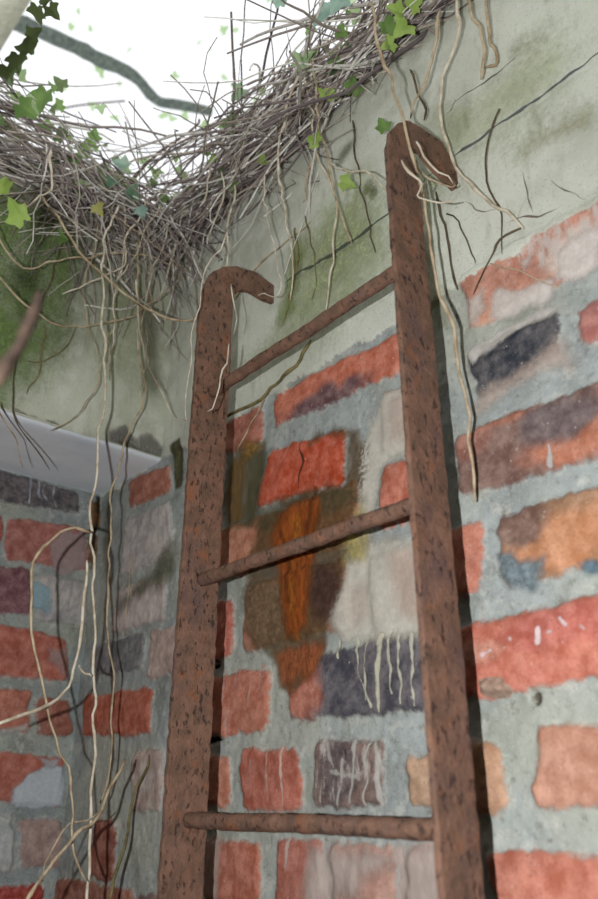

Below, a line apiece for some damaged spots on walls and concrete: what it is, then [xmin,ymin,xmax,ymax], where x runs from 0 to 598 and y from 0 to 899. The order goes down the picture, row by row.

crack [448,52,598,157]
crack [283,214,388,285]
crack [297,439,305,482]
leakage [359,388,405,514]
leakage [328,529,419,711]
leakage [326,738,384,807]